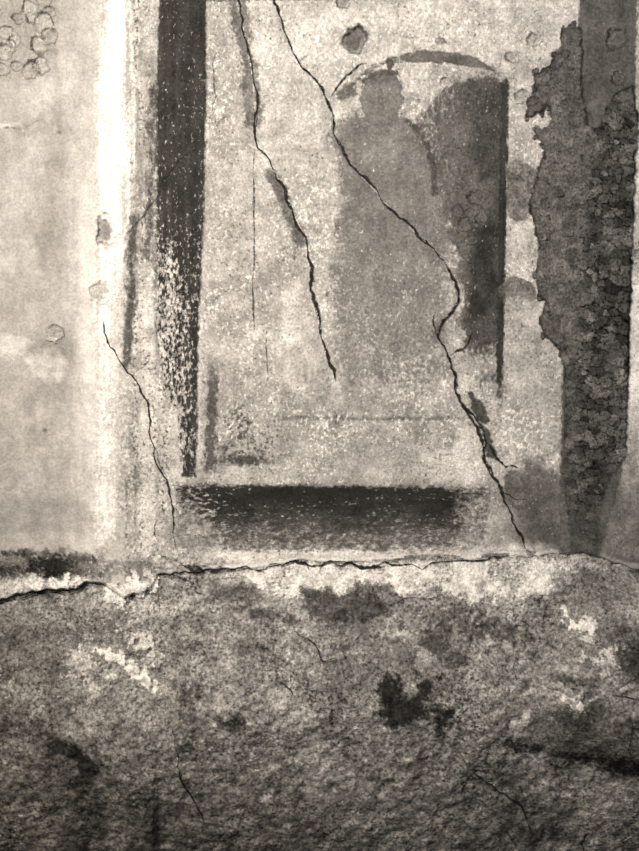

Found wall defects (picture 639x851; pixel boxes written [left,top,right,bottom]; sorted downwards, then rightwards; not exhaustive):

spalling [0,0,57,79]
crack [103,0,525,599]
peeling [498,20,639,536]
crack [0,581,102,602]
leakage [0,547,639,777]
leakage [295,736,374,811]